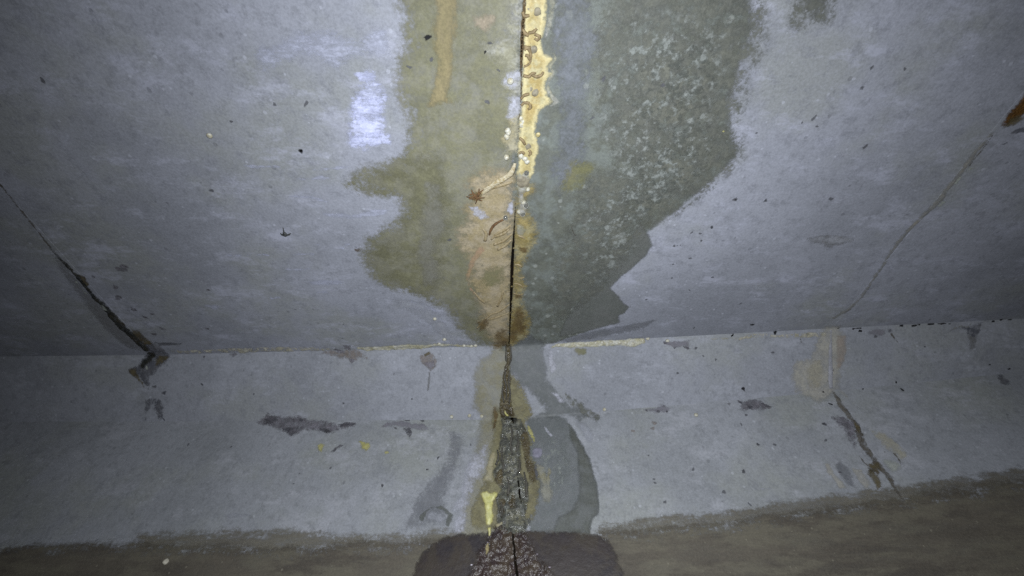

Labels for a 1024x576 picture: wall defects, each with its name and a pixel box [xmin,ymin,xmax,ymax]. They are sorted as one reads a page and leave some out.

crack [518,0,526,129]
water stain [348,0,524,351]
water stain [506,0,767,346]
crack [0,184,152,352]
crack [508,208,516,344]
spalling [257,415,355,436]
water stain [0,335,1024,576]
crack [832,392,901,496]